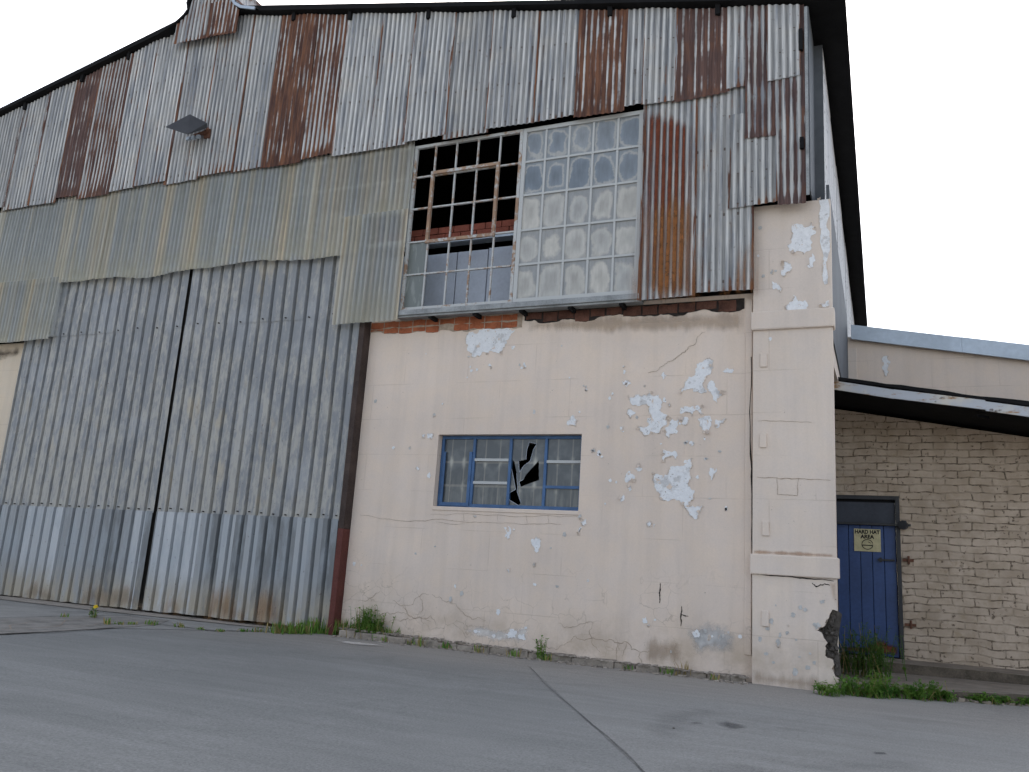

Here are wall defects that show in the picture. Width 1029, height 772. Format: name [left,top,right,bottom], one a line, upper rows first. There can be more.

corrosion [647,116,691,294]
peeling [762,197,831,310]
spalling [370,298,745,378]
peeling [606,357,734,519]
crack [364,513,564,525]
crack [532,583,686,665]
spalling [792,600,842,679]